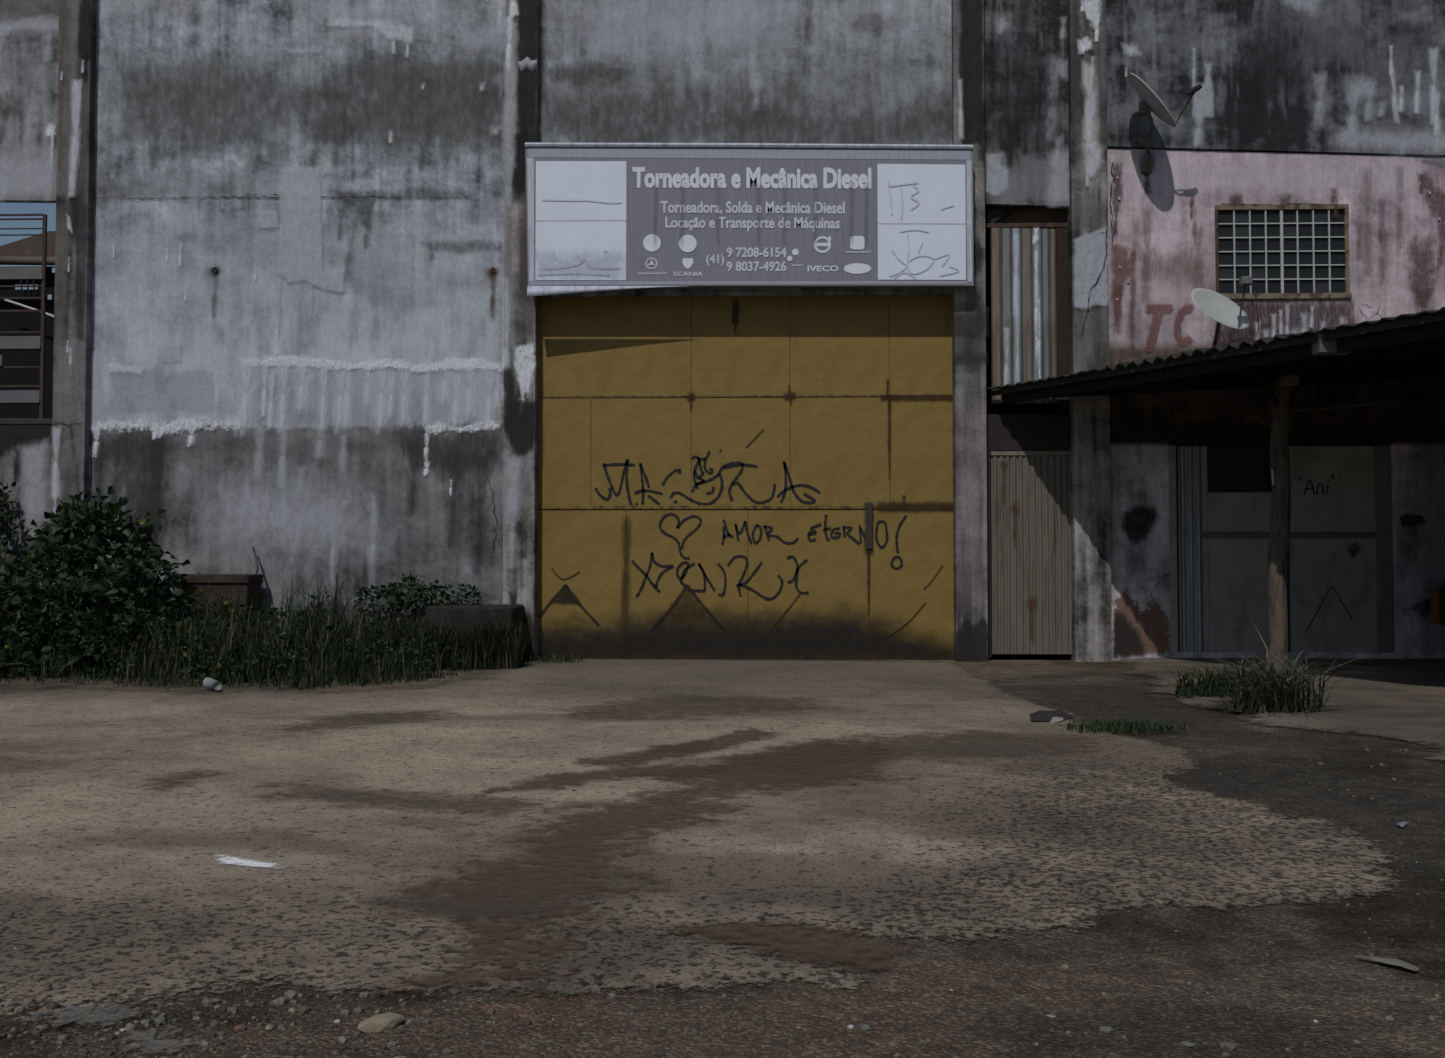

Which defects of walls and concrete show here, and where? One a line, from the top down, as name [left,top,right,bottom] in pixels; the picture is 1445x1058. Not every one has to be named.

peeling [1078,0,1135,347]
flaking render [1111,589,1171,656]